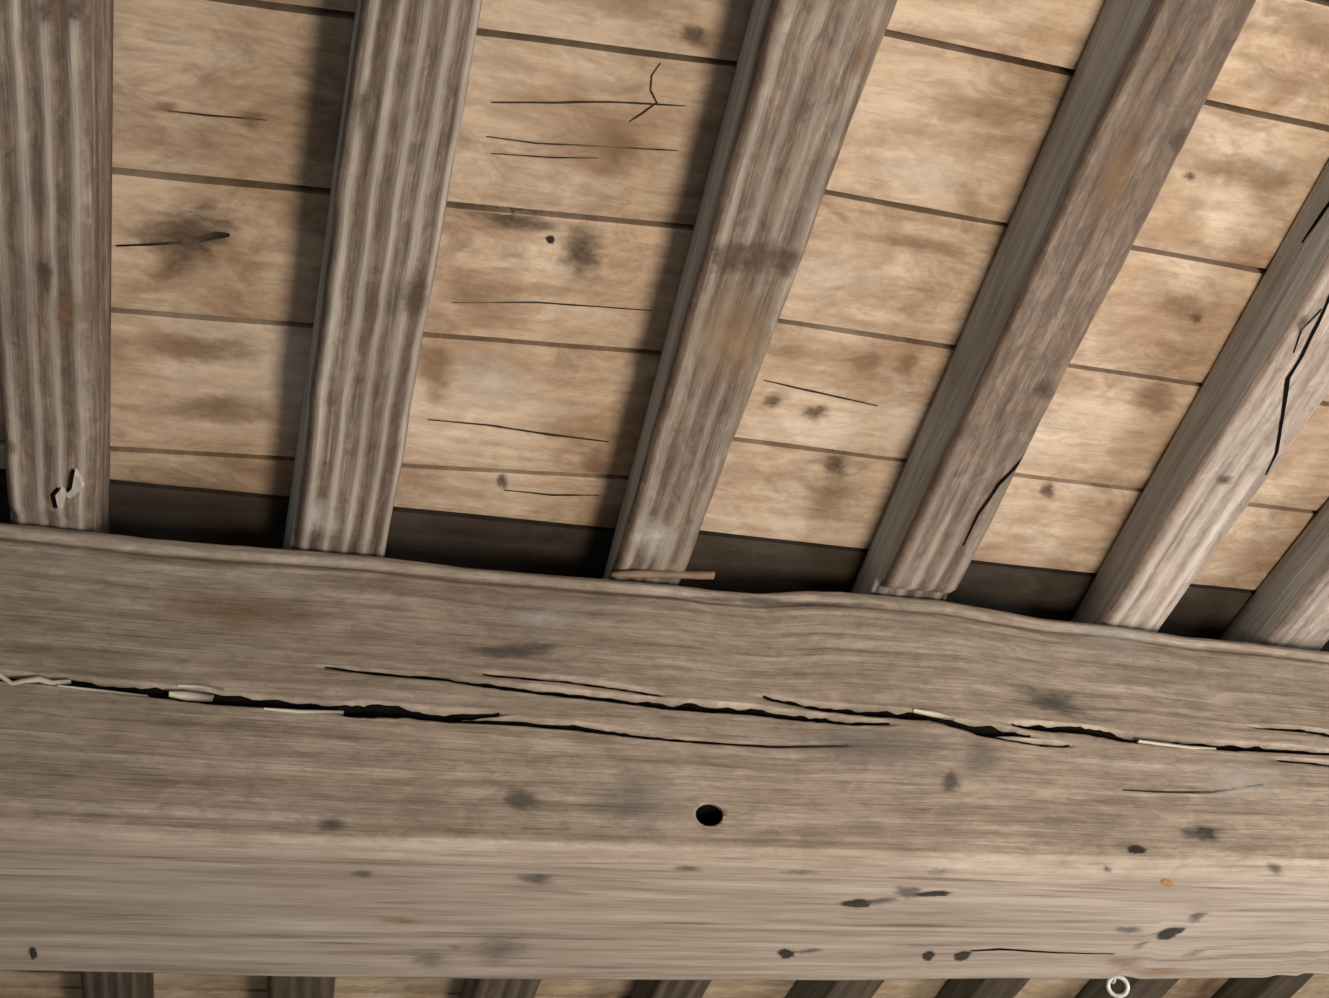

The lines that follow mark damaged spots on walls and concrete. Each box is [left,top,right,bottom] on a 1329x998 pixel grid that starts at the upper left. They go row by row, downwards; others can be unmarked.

crack [486,63,685,159]
crack [1301,201,1329,243]
crack [1265,296,1329,475]
crack [963,451,1026,546]
crack [0,667,1329,794]